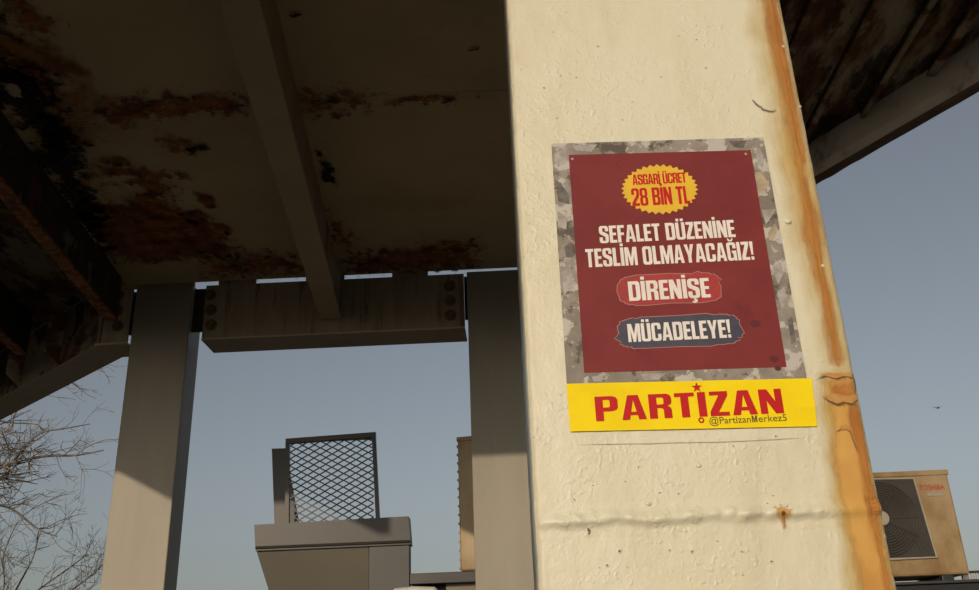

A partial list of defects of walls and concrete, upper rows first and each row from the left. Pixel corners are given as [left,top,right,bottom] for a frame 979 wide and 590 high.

rust [326,209,490,277]
rust [763,0,844,365]
peeling [820,372,857,406]
rust [824,378,894,590]